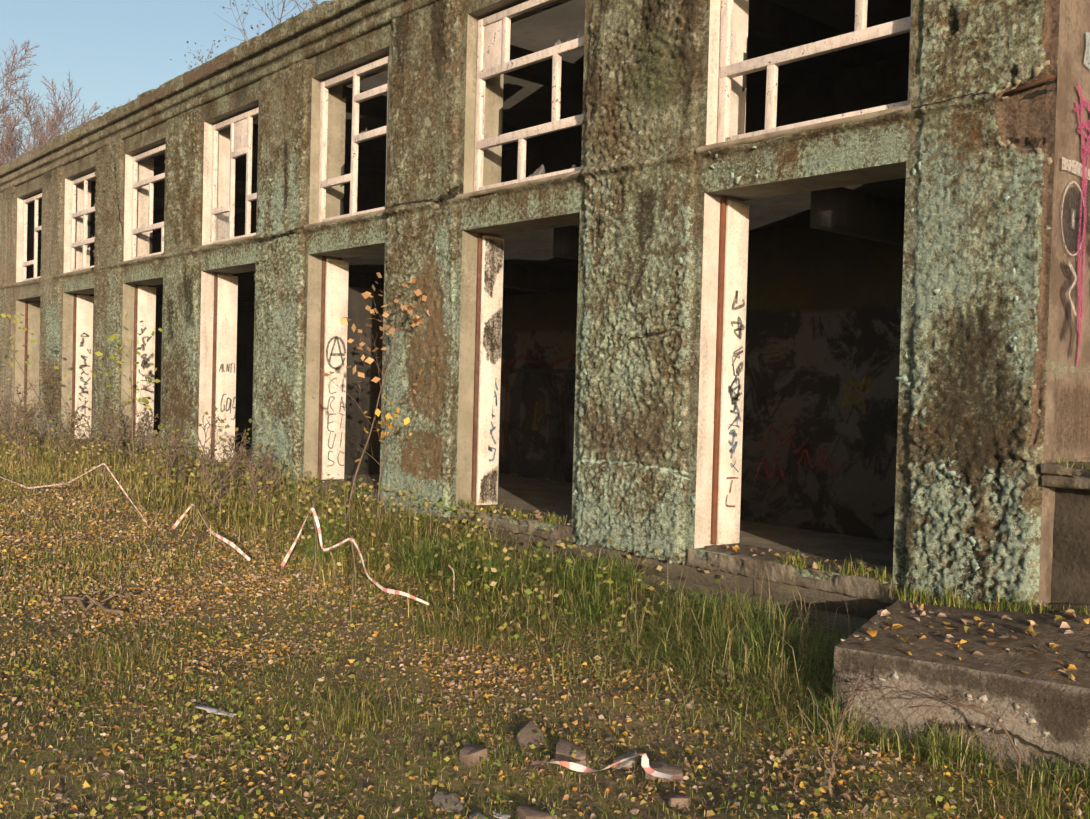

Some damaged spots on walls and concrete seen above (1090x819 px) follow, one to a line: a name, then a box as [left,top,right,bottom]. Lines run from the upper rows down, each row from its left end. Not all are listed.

damp [588,0,624,116]
damp [639,0,702,124]
spalling [380,184,464,515]
damp [916,296,1022,502]